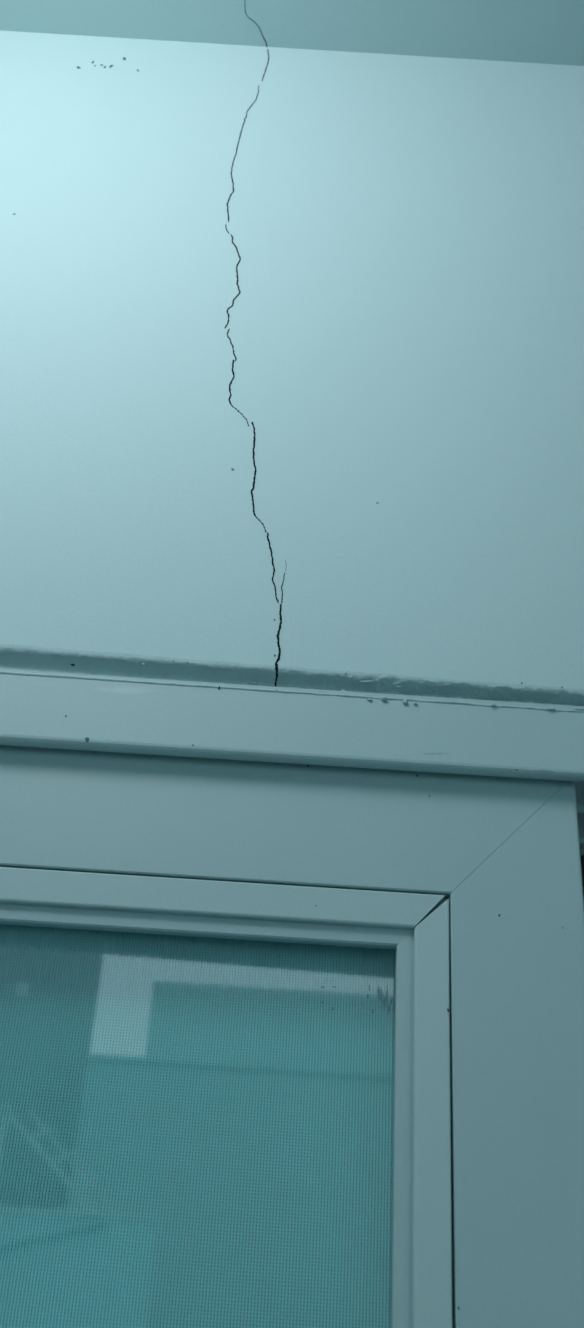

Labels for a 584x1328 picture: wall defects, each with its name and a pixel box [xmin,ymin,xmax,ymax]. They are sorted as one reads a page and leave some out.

crack [225,2,287,691]